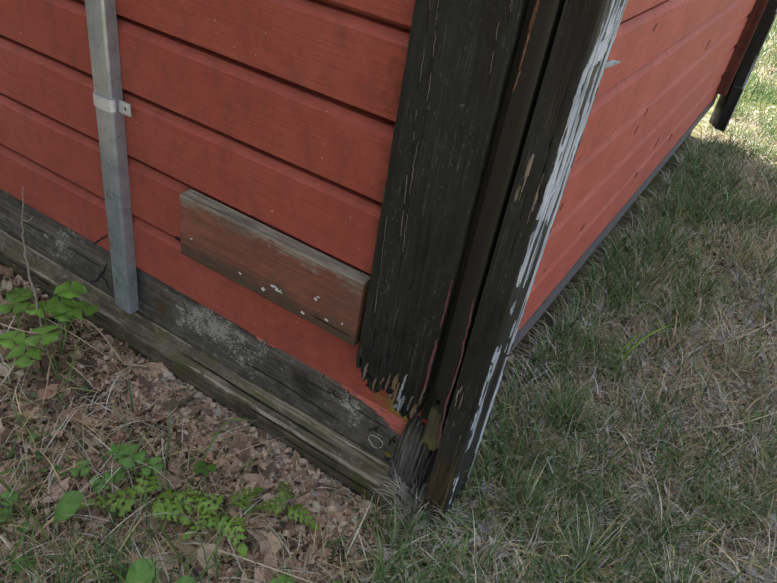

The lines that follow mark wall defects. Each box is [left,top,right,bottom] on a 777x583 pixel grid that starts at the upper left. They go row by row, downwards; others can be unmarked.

damp [0,230,115,300]
peeling [449,0,628,505]
damp [183,362,391,485]
peeling [341,384,407,435]